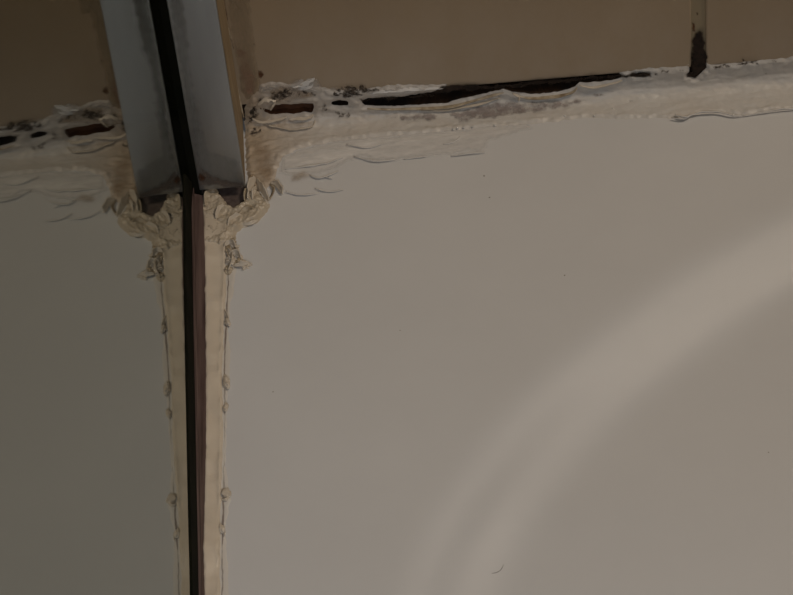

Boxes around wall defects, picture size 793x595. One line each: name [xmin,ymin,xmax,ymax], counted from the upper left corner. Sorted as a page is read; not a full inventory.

damp [687,31,758,78]
peeling [292,78,315,90]